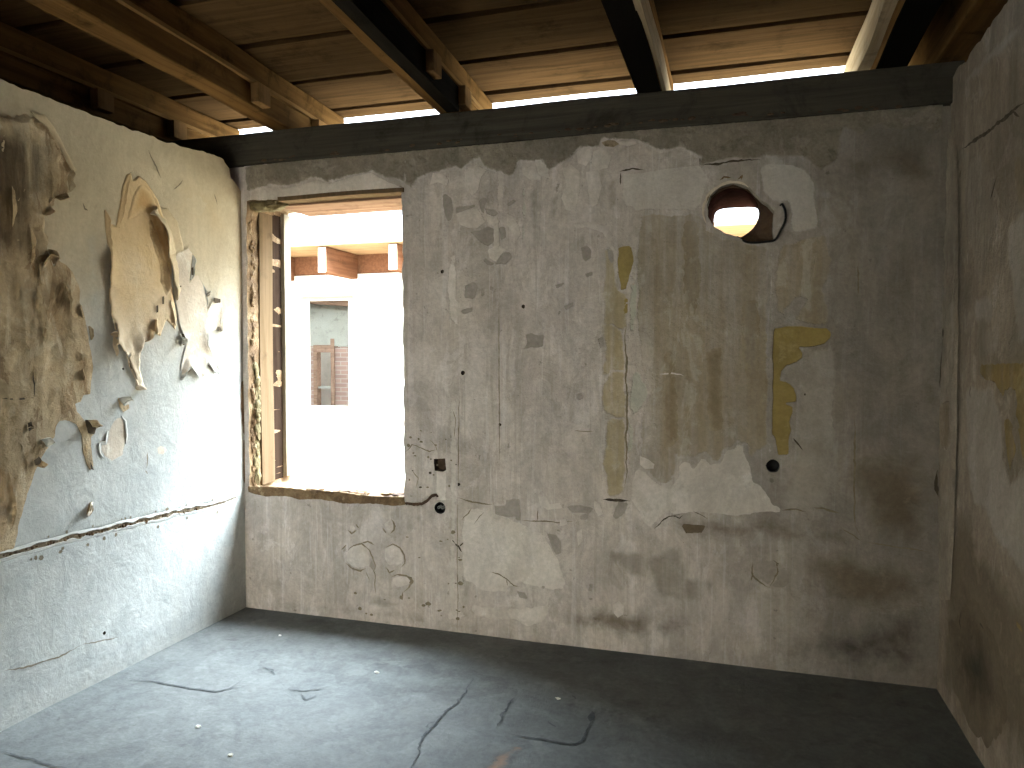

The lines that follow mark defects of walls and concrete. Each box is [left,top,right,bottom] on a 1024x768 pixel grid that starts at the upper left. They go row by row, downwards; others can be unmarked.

crack [960,103,1024,174]
peeling [44,160,76,216]
flaking render [1006,209,1024,346]
peeling [0,173,224,554]
peeling [241,105,944,626]
flaking render [965,362,1024,580]
crack [5,637,117,671]
crack [411,680,473,768]
crack [497,695,595,744]